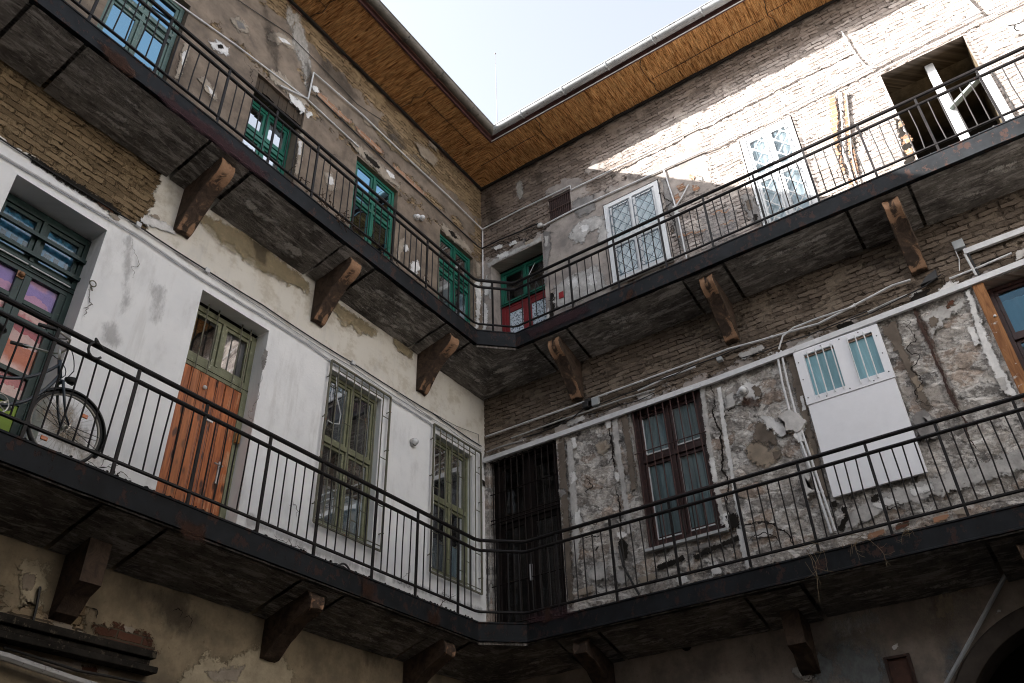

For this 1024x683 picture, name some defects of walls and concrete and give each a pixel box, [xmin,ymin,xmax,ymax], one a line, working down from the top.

flaking render [828,92,863,186]
flaking render [28,153,122,221]
spalling [140,214,176,234]
peeling [200,215,314,296]
crack [710,385,793,569]
peeling [743,415,807,469]
peeling [4,556,161,654]